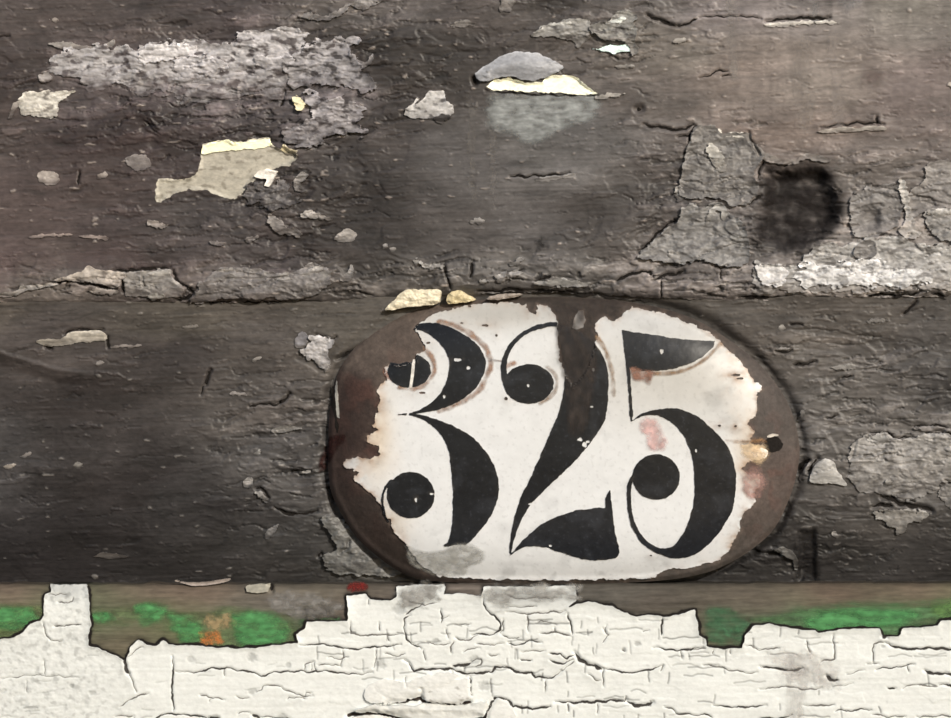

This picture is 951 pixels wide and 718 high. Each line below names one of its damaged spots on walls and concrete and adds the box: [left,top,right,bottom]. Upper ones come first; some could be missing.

crack [647,15,828,27]
peeling [8,0,382,238]
peeling [486,75,625,99]
peeling [637,124,951,295]
rust [551,302,620,428]
rust [630,350,714,382]
rust [319,435,345,471]
rust [742,439,765,498]
peeling [799,426,951,535]
crack [4,593,81,691]
crack [115,647,146,717]
crack [156,595,951,718]